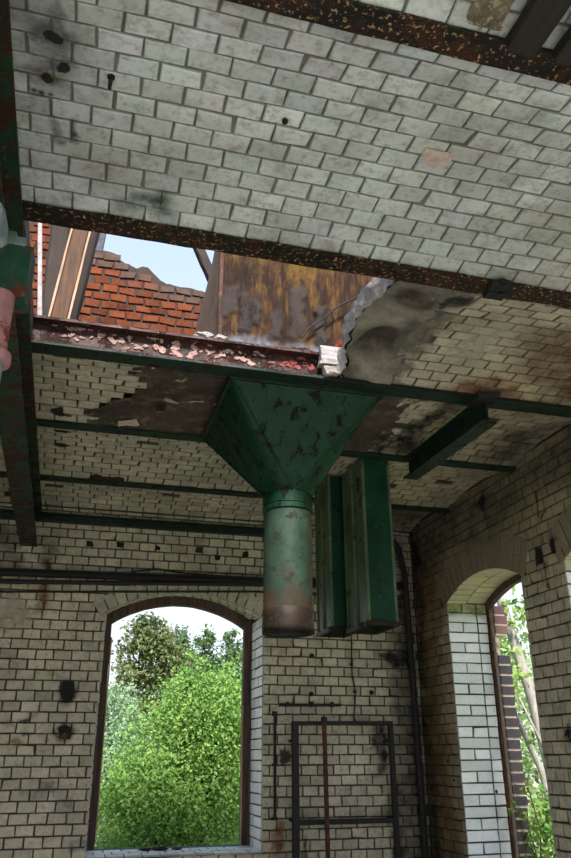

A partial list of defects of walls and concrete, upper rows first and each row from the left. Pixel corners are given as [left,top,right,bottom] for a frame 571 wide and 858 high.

spalling [466,0,515,31]
damp [439,297,472,309]
spalling [87,367,228,435]
damp [370,403,456,453]